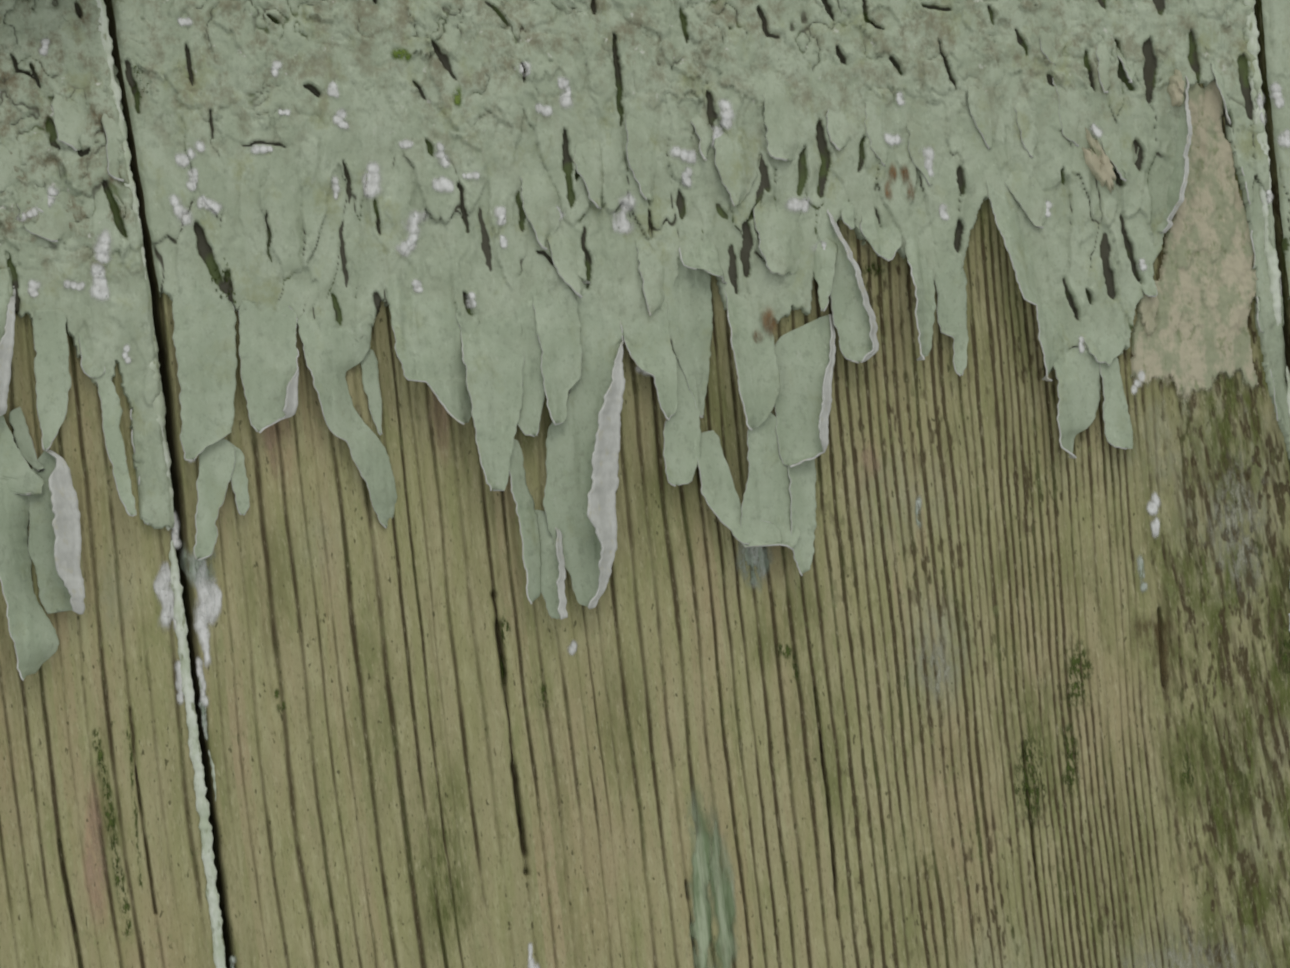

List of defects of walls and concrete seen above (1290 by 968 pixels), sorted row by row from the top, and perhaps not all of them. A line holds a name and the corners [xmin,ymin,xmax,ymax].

peeling [0,0,1290,739]
crack [131,723,155,909]